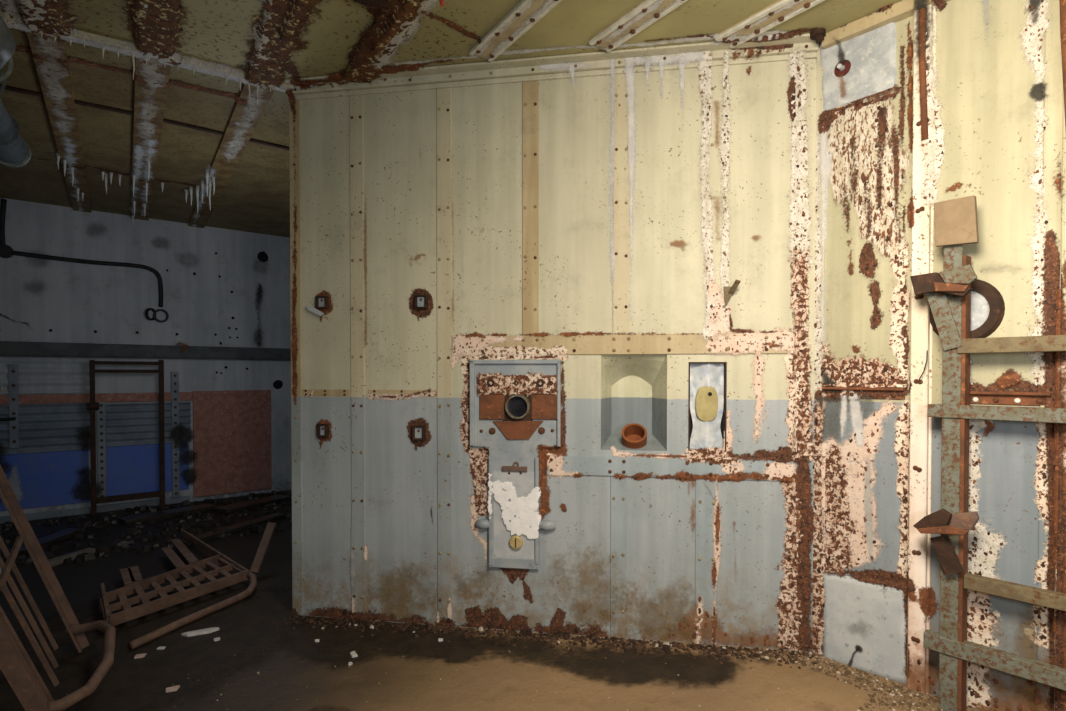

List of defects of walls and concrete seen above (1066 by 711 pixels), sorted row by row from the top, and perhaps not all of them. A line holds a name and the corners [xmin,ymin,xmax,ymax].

water stain [101,140,164,225]
water stain [18,25,313,105]
water stain [184,168,215,227]
water stain [372,0,803,281]
peeling [692,48,913,655]
rust [817,23,914,161]
peeling [918,23,946,206]
peeling [1018,0,1060,336]
rust [1041,230,1066,336]
rust [613,434,938,694]
peeling [968,419,1007,580]
rust [1043,423,1066,594]